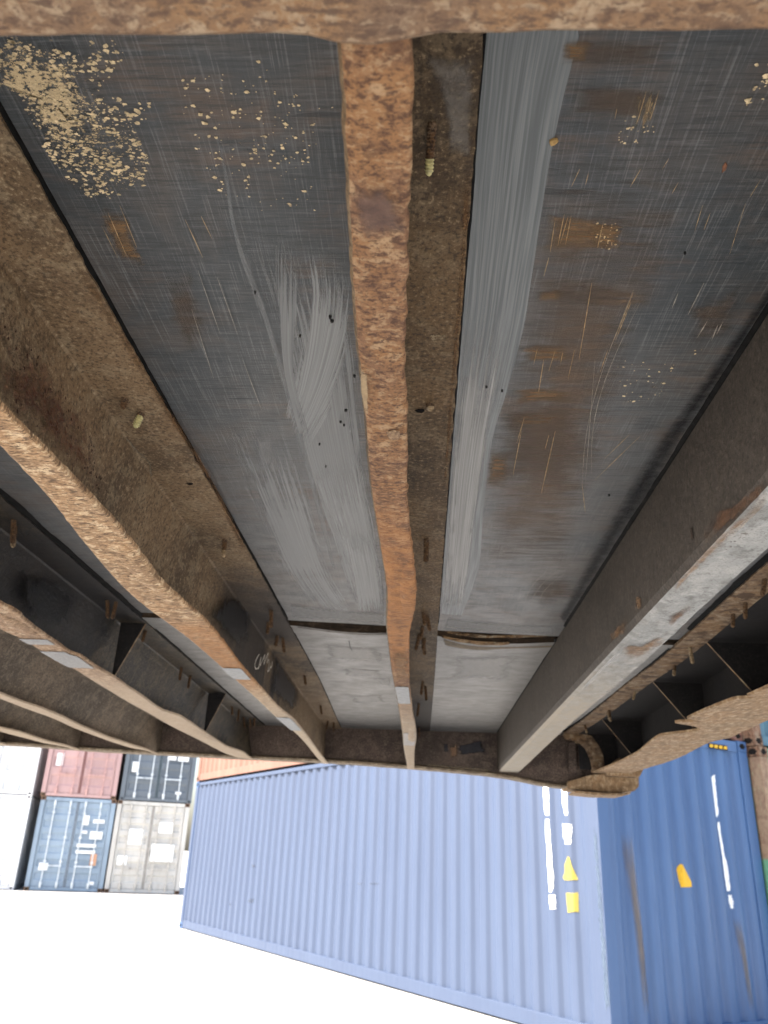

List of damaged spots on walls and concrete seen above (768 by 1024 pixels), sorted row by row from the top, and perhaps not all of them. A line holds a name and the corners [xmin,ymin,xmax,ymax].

peeling [0,36,151,258]
peeling [181,74,316,211]